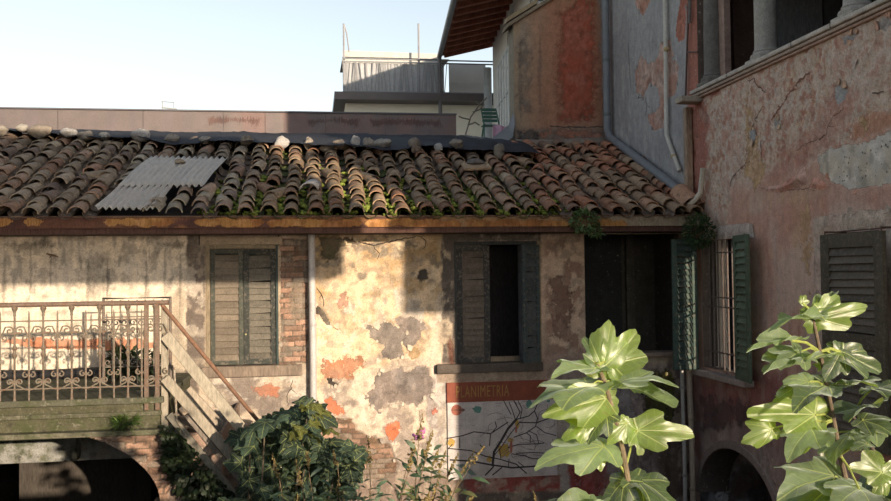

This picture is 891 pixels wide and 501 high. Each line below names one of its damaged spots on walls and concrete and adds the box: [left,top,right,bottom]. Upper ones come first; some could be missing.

flaking render [635,0,687,131]
crack [730,73,810,185]
crack [335,236,427,259]
flaking render [278,238,330,365]
peeling [337,292,348,309]
peeling [251,383,280,398]
peeling [320,355,366,417]
flaking render [364,316,438,416]
peeling [367,416,401,445]